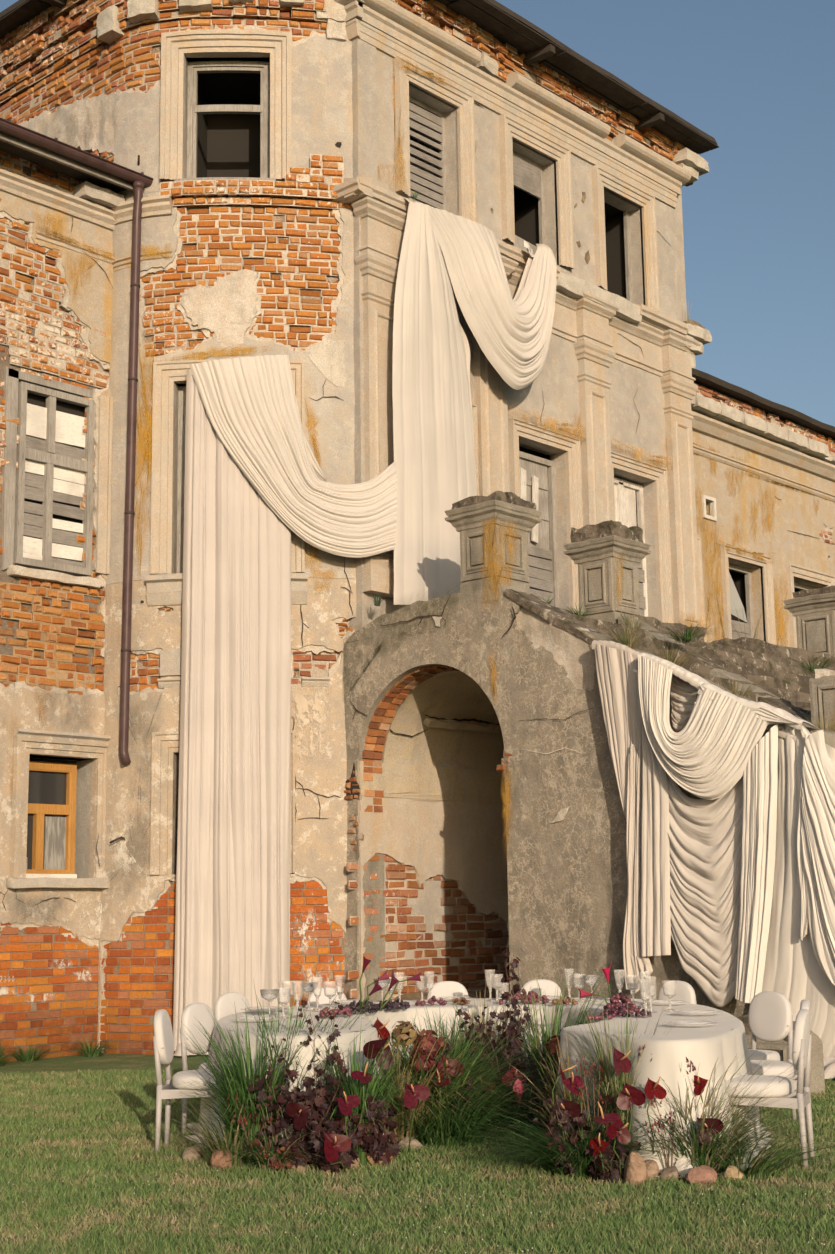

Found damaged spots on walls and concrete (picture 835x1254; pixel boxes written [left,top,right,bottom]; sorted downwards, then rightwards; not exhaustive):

spalling [0,0,343,162]
spalling [394,0,686,161]
spalling [0,150,83,192]
spalling [140,142,353,387]
spalling [0,218,109,510]
spalling [694,383,835,456]
spalling [0,529,105,695]
crack [502,606,516,638]
leakage [775,595,785,644]
crack [0,890,76,910]
spalling [344,665,512,1000]